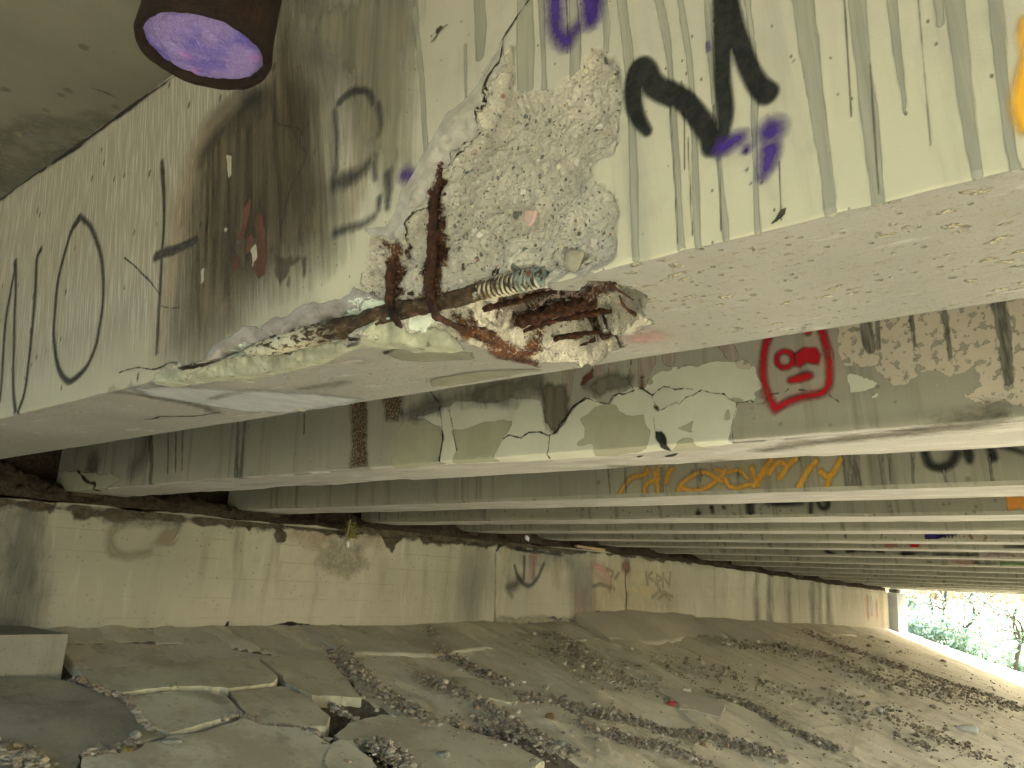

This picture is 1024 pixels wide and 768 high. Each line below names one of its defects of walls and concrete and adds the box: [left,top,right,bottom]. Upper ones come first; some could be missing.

crack [404,0,529,242]
spalling [153,40,655,397]
corrosion [382,162,455,302]
corrosion [350,402,367,468]
leakage [343,296,385,317]
leakage [408,313,439,334]
crack [430,391,457,464]
corrosion [452,281,637,367]
crack [503,361,806,459]
peeling [637,353,675,388]
peeling [718,344,751,369]
peeling [837,298,1024,407]